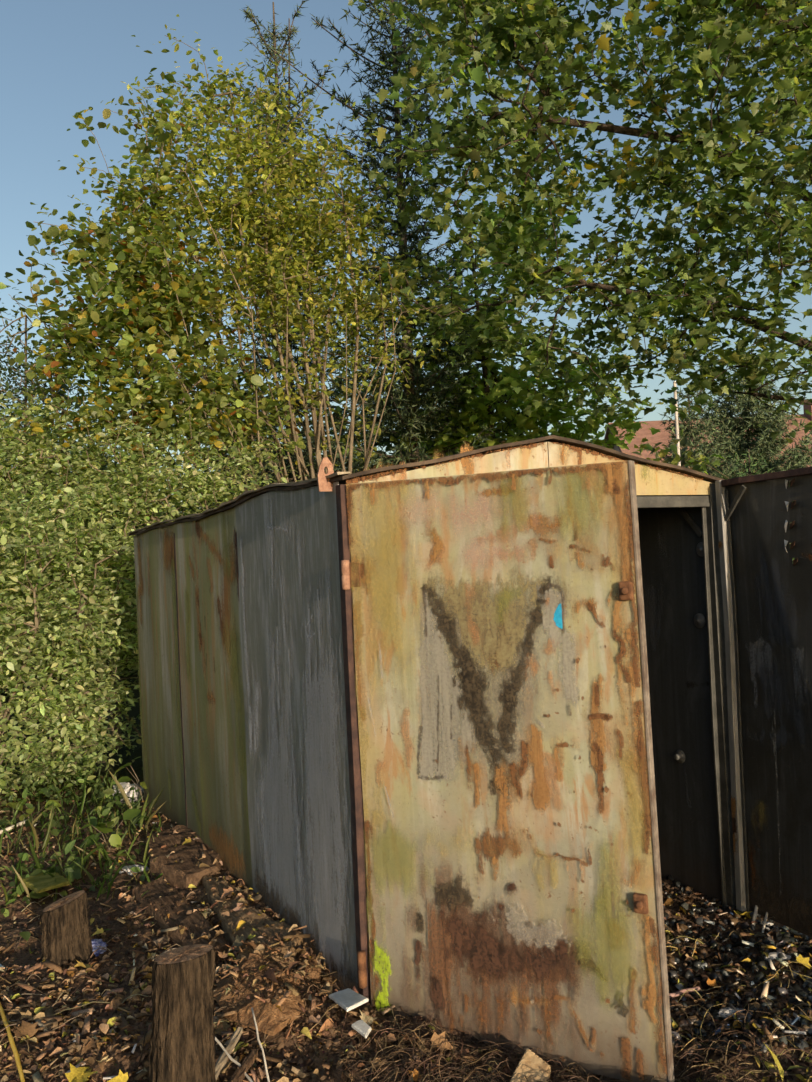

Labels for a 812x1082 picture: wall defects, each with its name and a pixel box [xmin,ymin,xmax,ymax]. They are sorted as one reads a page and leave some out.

rust [189,520,235,678]
rust [346,442,703,887]
rust [621,914,667,1080]